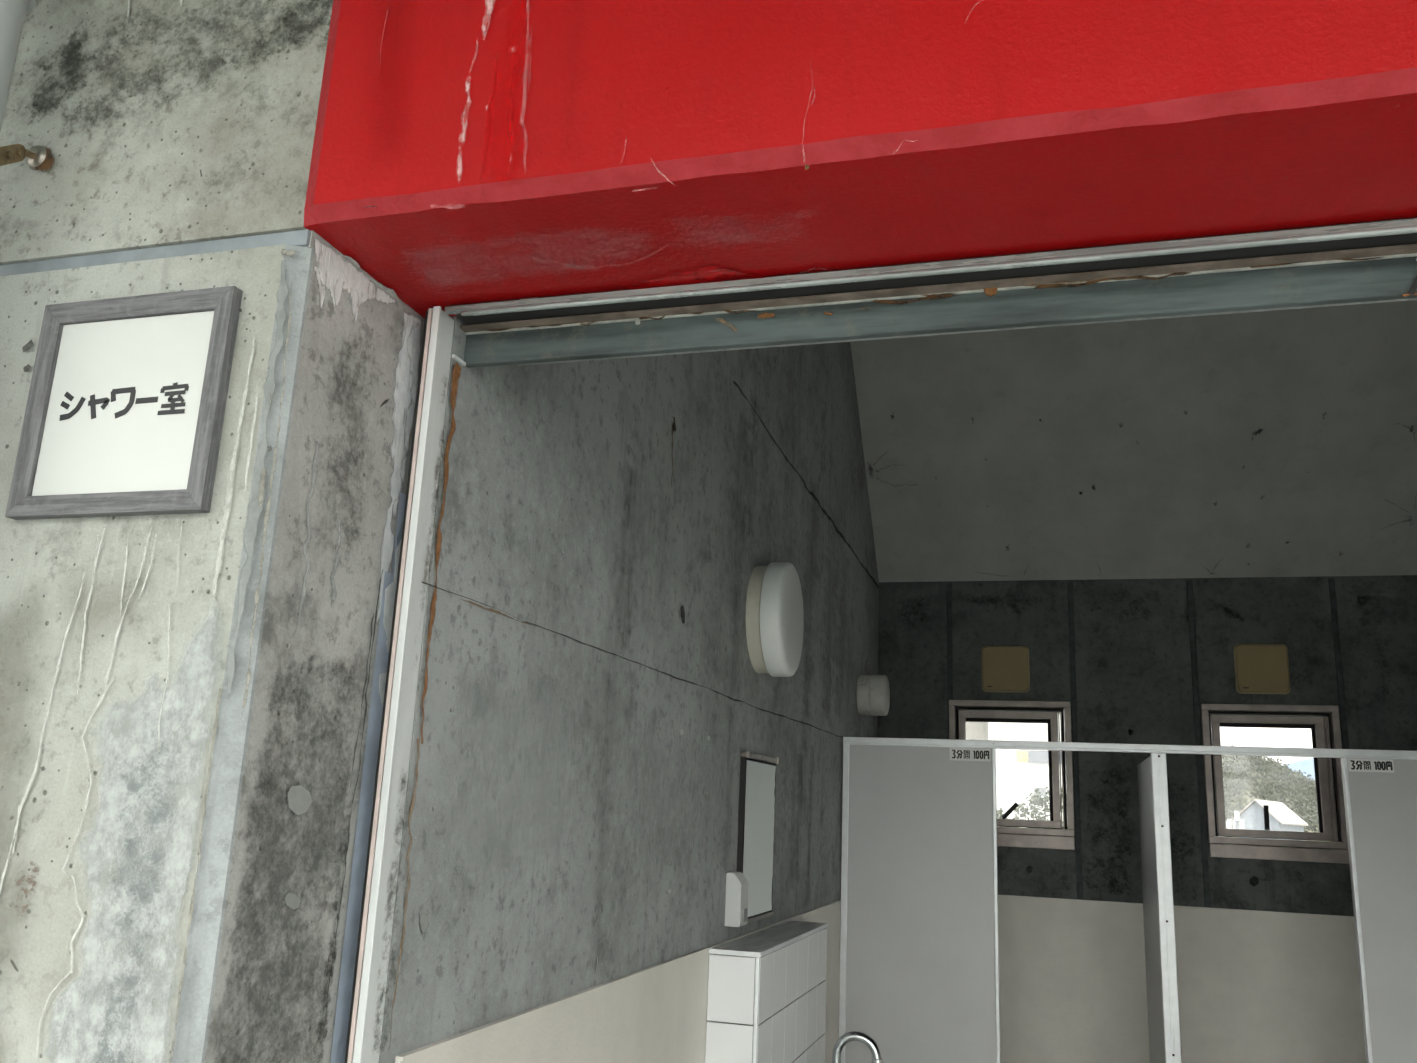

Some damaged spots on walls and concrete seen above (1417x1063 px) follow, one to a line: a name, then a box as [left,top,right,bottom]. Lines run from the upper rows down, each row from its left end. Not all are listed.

leakage [26,0,332,133]
leakage [0,528,105,933]
leakage [104,533,157,691]
leakage [220,656,356,1063]
rust [390,362,461,1040]
crack [733,381,879,589]